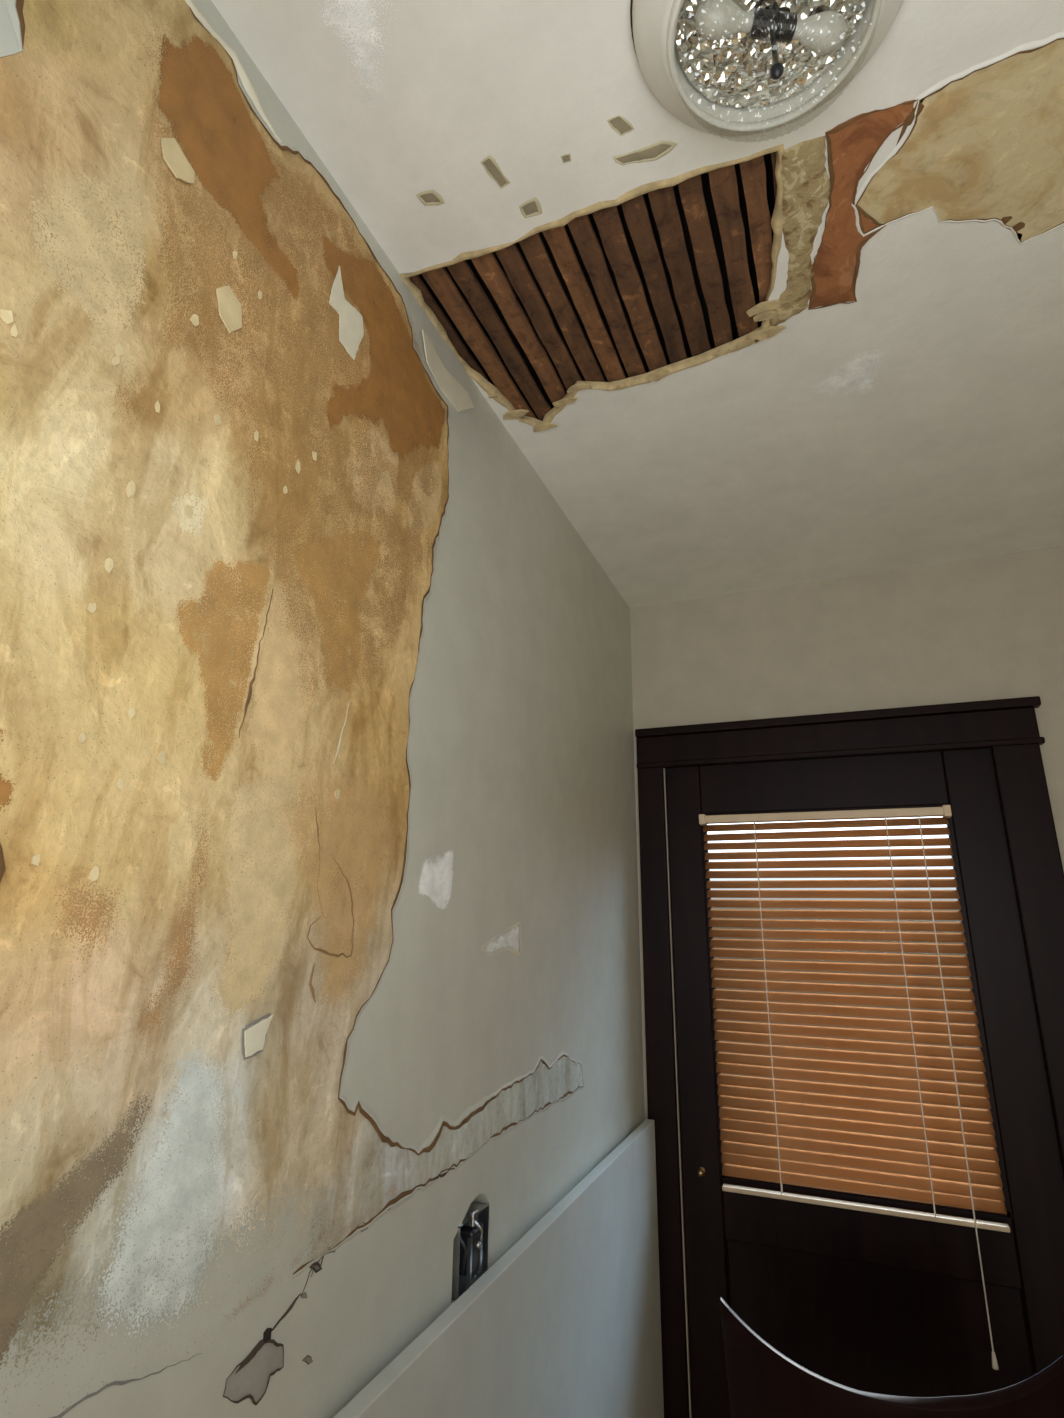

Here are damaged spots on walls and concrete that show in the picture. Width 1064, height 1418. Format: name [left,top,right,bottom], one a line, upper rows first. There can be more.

water stain [127,12,446,714]
peeling [0,0,788,1405]
water stain [260,764,399,1017]
water stain [0,1090,154,1369]
crack [50,1353,202,1418]
crack [235,1251,334,1374]
crack [417,1147,478,1190]